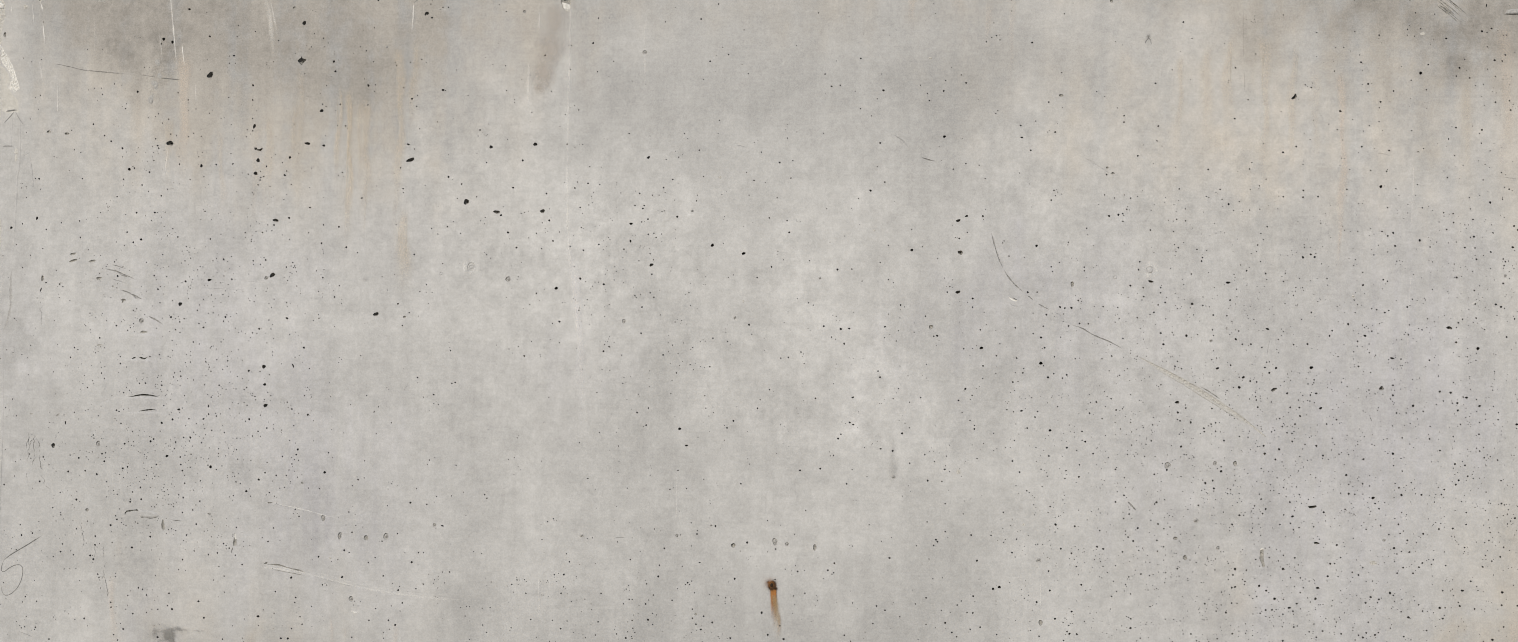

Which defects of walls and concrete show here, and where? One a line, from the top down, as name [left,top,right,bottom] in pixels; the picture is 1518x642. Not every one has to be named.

corrosion [767,581,777,612]